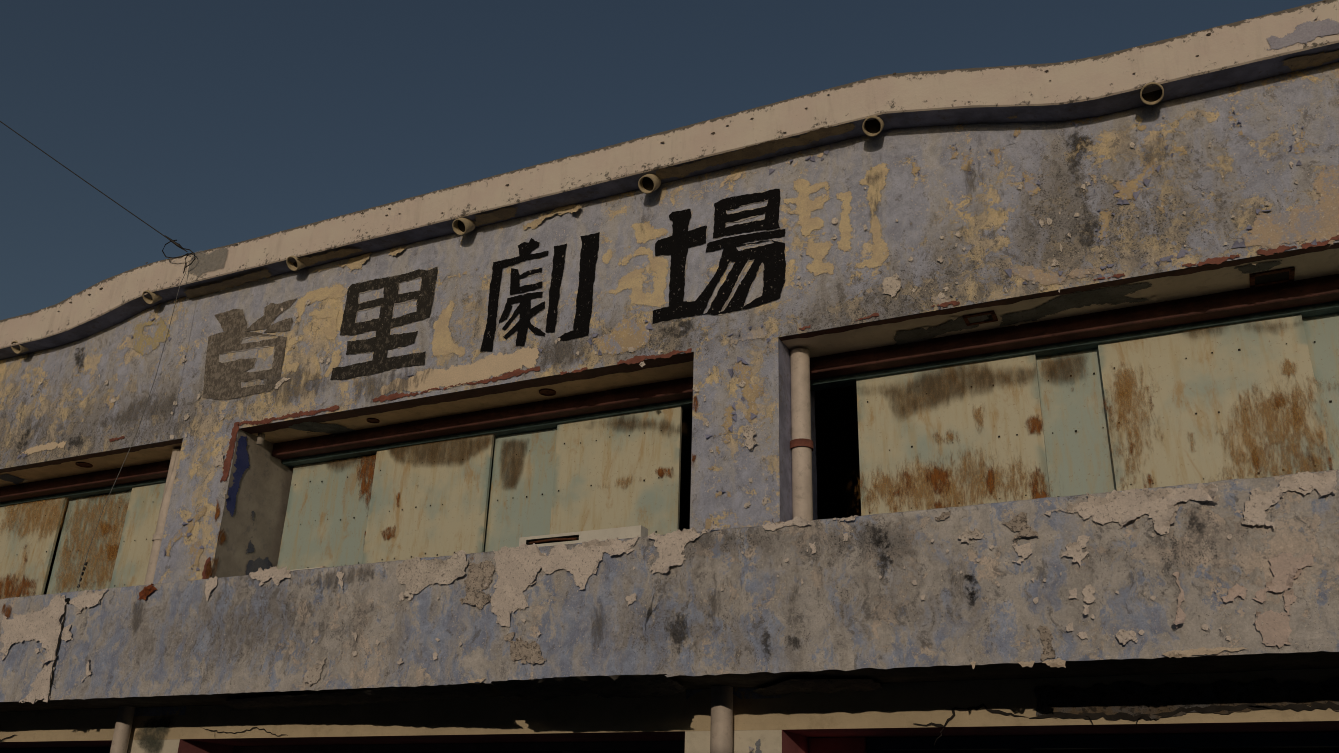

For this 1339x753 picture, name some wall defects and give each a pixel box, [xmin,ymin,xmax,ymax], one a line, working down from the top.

peeling [296,123,855,395]
peeling [0,588,107,704]
corrosion [0,493,129,619]
corrosion [327,436,525,504]
peeling [395,518,721,664]
corrosion [860,432,1047,512]
corrosion [1027,416,1043,434]
peeling [1002,483,1219,604]
flaking render [1162,624,1247,658]
corrosion [1223,359,1333,479]
peeling [1227,470,1337,540]
crack [913,701,1339,745]